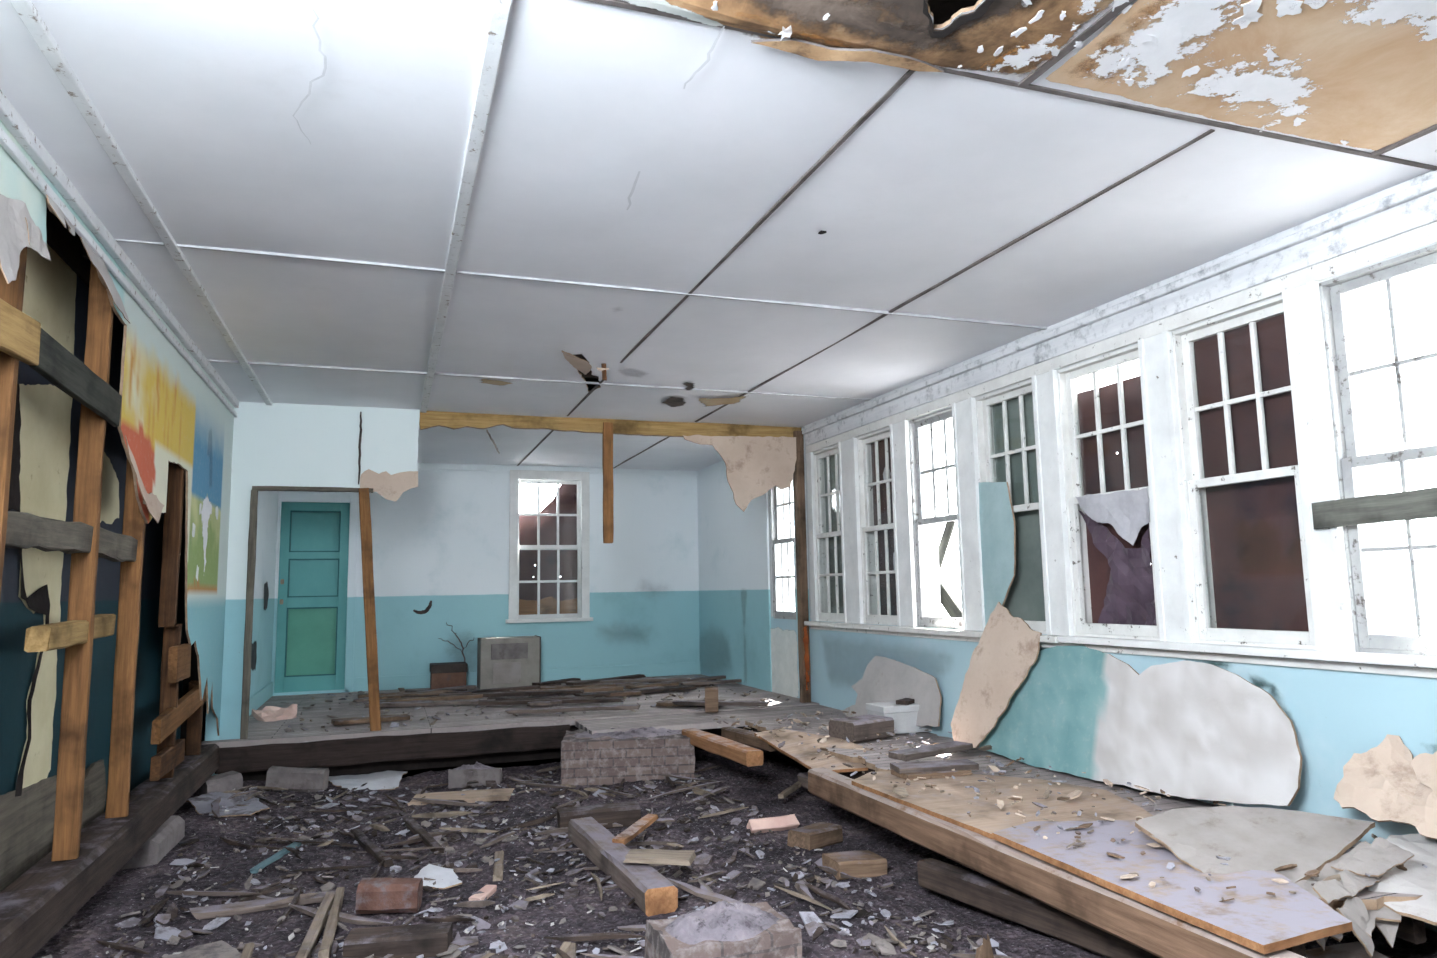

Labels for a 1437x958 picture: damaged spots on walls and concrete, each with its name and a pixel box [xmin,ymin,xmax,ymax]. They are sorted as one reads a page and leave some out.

peeling [624,0,723,26]
peeling [768,25,792,40]
water stain [666,0,1114,75]
crack [293,9,327,144]
peeling [977,0,1437,151]
peeling [25,217,51,261]
peeling [192,497,218,581]